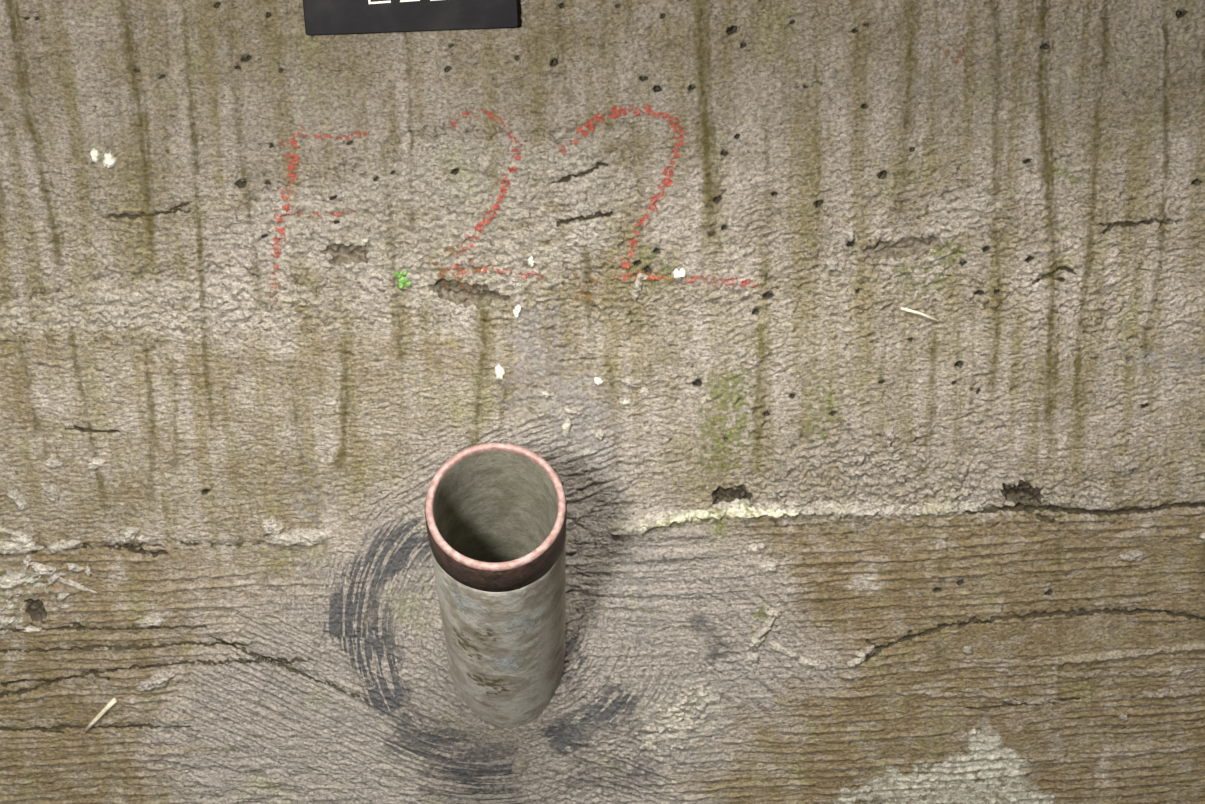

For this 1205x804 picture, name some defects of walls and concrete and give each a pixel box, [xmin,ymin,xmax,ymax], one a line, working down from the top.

spalling [0,526,98,633]
crack [865,608,1205,662]
crack [967,697,1087,709]